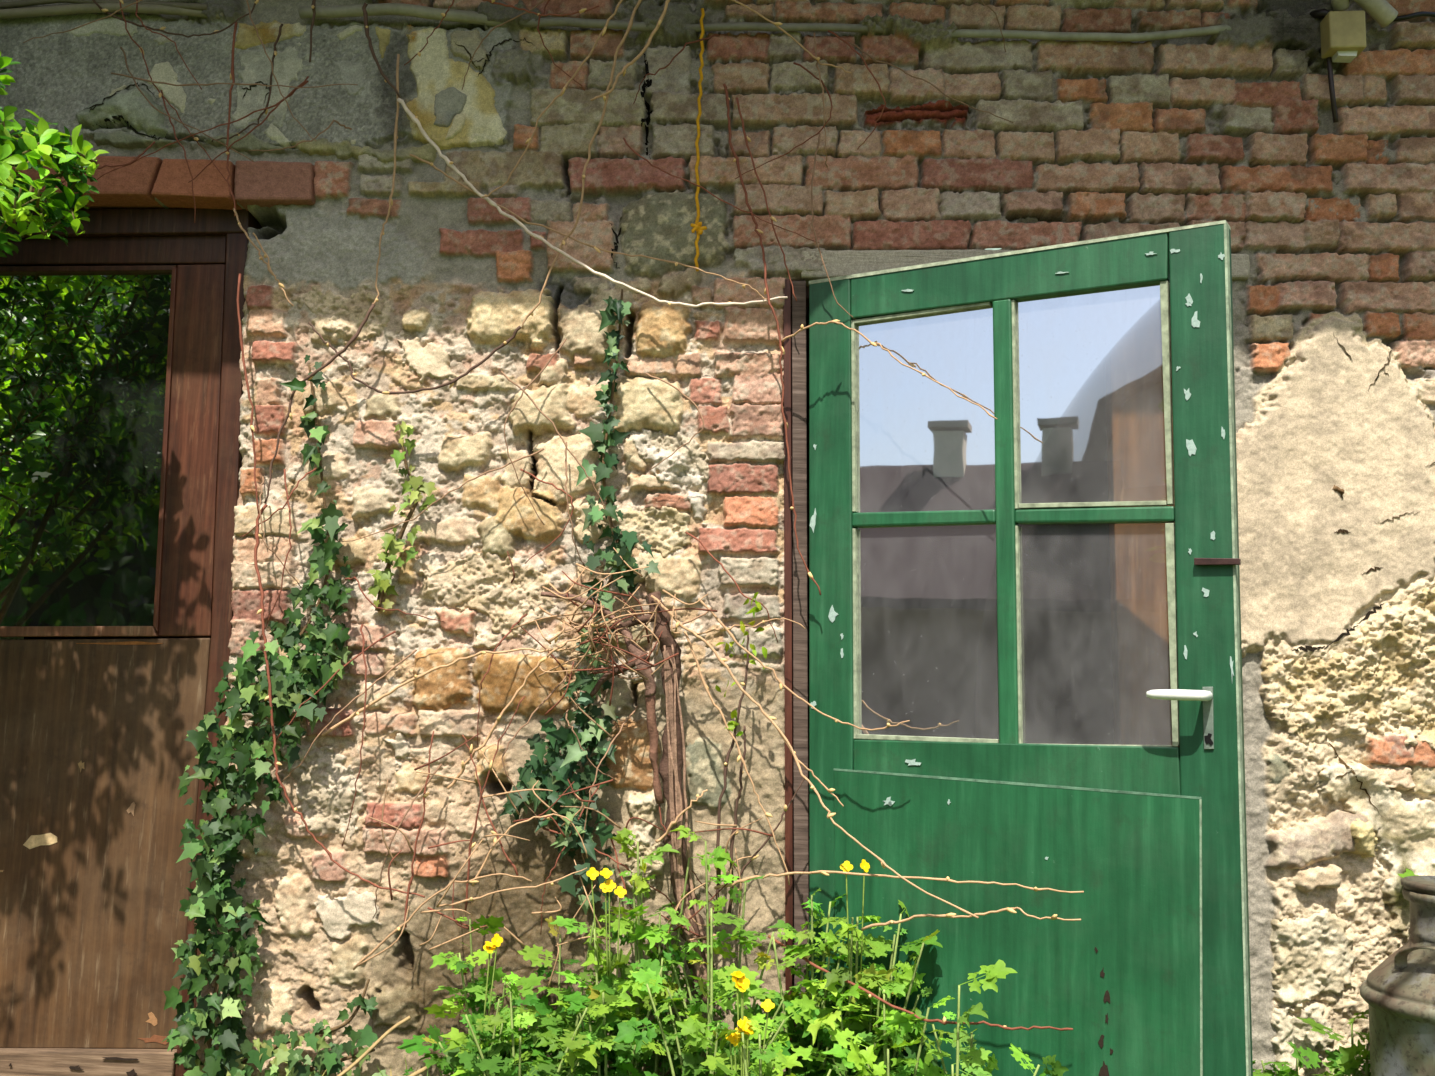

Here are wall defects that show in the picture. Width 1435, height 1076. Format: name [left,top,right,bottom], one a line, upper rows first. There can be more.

peeling [332,25,507,150]
crack [640,48,652,159]
crack [529,441,555,504]
flaking render [603,428,709,584]
crack [1334,511,1418,534]
flaking render [418,550,558,649]
crack [1292,567,1384,652]
flaking render [1258,587,1435,749]
flaking render [280,742,368,837]
flaking render [1317,761,1435,937]
flaking render [314,886,382,940]
flaking render [1269,905,1356,1071]